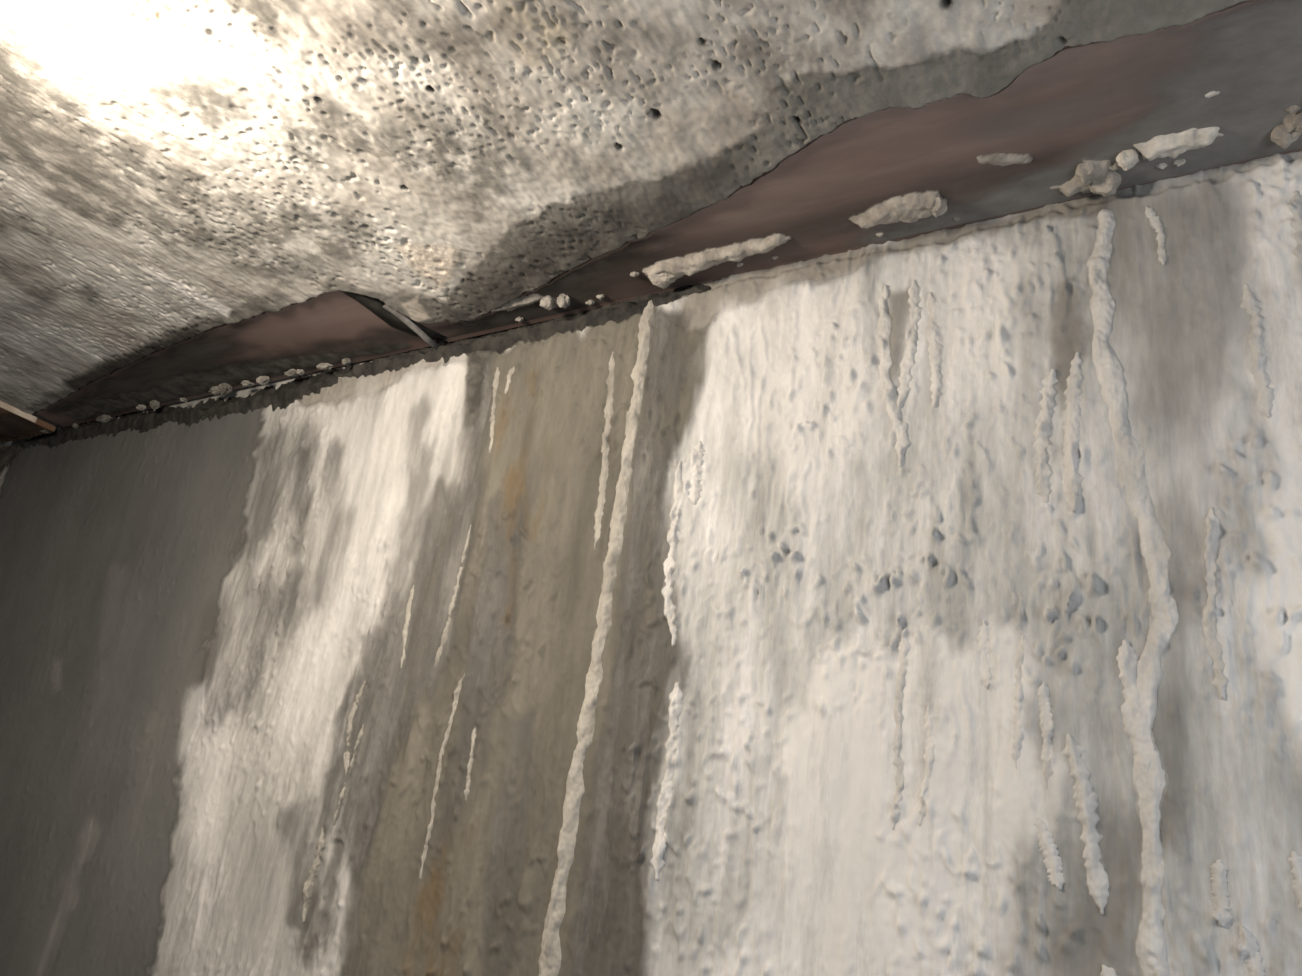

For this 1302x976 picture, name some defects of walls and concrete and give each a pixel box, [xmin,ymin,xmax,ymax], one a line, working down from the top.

flaking render [299,354,469,406]
spalling [403,300,428,322]
spalling [396,245,458,287]
flaking render [683,194,1104,331]
flaking render [890,293,907,372]
damp [877,252,1031,468]
flaking render [1053,289,1077,387]
damp [1239,154,1302,744]
damp [302,300,706,976]
damp [1032,209,1181,976]
damp [1201,507,1229,700]
damp [715,619,1111,976]